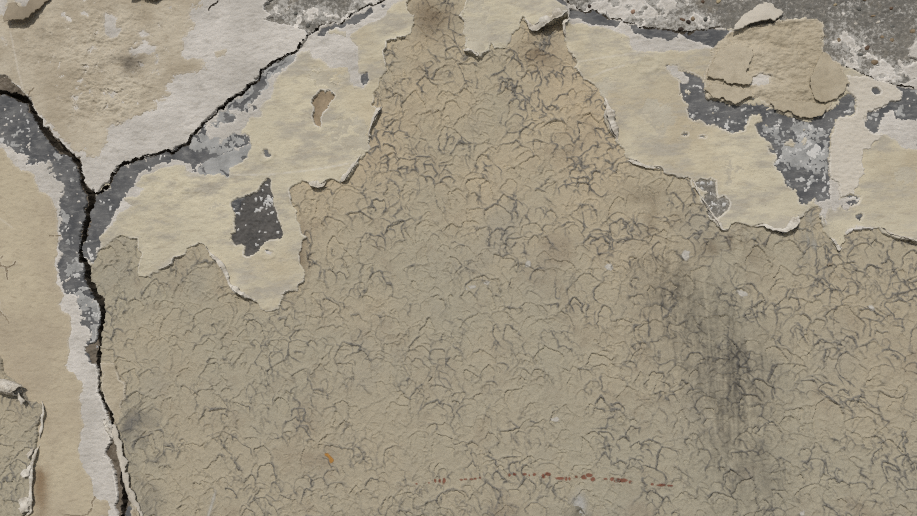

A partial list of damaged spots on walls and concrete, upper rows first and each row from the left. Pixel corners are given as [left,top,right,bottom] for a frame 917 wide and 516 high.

crack [0,0,385,446]
peeling [0,0,415,516]
crack [567,0,721,35]
peeling [458,0,917,251]
crack [64,496,96,516]
crack [120,472,131,516]